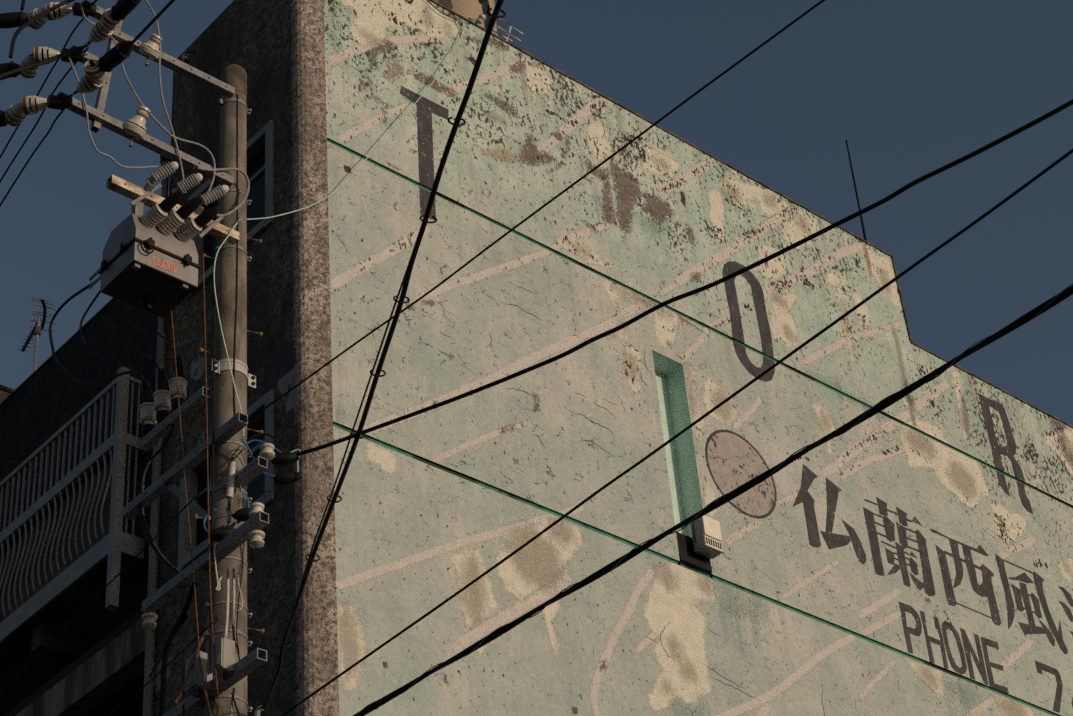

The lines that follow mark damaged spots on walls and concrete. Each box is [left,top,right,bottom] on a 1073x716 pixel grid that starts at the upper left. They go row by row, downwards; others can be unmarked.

peeling [359,40,457,123]
peeling [487,95,518,125]
peeling [585,160,686,232]